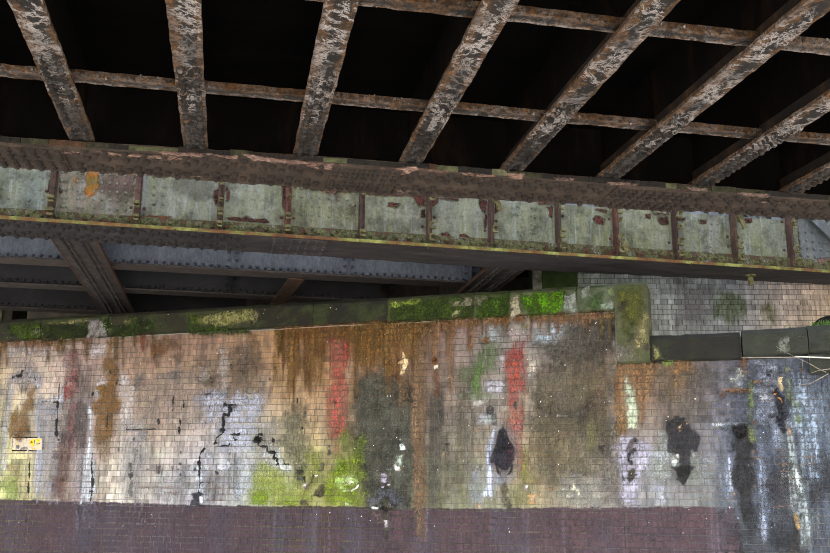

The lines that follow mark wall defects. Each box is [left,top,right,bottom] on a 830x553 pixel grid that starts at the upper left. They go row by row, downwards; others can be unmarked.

corrosion [74,171,99,196]
crack [106,411,156,432]
damp [118,351,321,505]
crack [197,393,306,493]
damp [327,337,420,508]
damp [428,365,448,503]
corrosion [273,310,614,539]
damp [453,315,704,508]
corrosion [613,361,656,436]
damp [712,359,830,553]